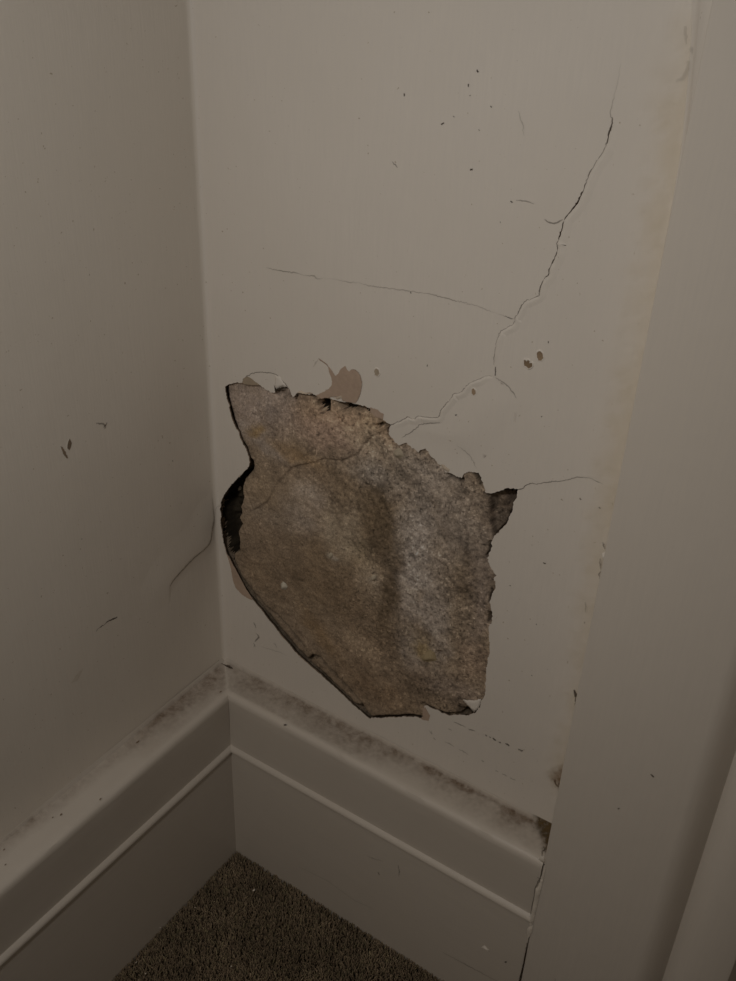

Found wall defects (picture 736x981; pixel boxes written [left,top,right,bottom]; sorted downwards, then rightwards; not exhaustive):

spalling [220,359,518,721]
damp [537,817,552,850]
crack [519,848,546,981]